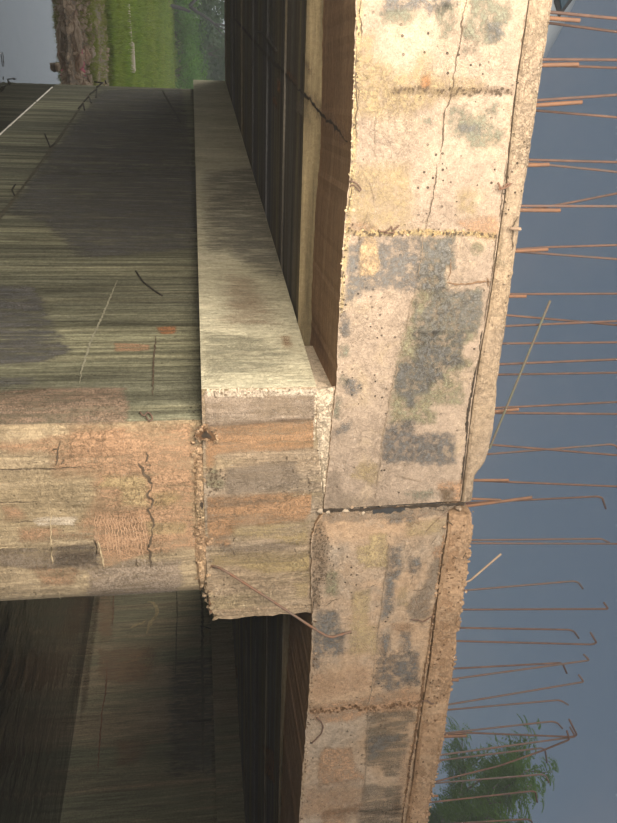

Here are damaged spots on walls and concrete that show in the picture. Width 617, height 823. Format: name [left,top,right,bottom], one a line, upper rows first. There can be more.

damp [0,286,70,364]
damp [12,89,197,257]
damp [347,235,482,465]
crack [375,1,467,503]
damp [0,377,215,776]
crack [136,453,157,568]
spalling [205,459,227,496]
damp [366,711,415,776]